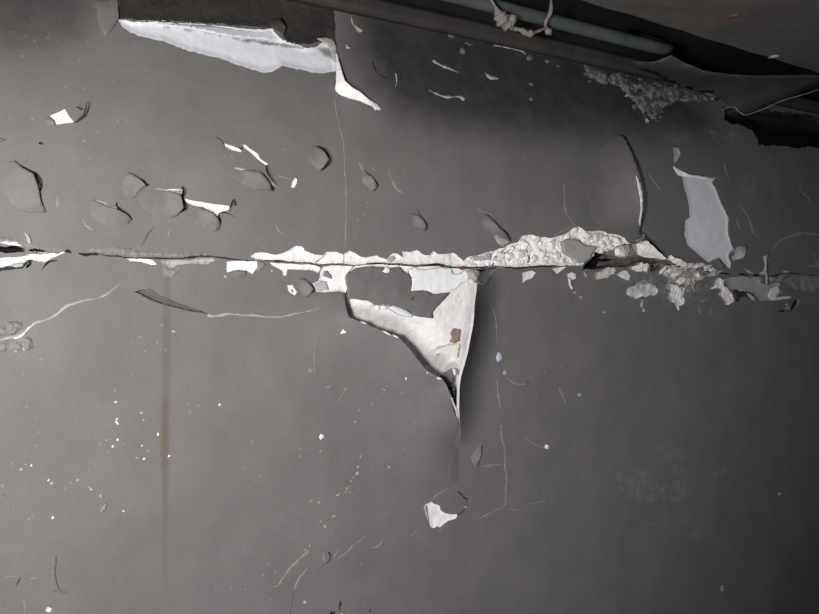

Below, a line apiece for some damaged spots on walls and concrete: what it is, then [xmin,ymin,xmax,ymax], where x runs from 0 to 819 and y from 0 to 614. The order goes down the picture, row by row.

peeling [90,0,381,110]
flaking render [0,233,64,270]
flaking render [128,258,215,268]
crack [0,230,556,273]
peeling [216,134,797,422]
crack [720,270,819,278]
peeling [136,288,207,315]
peeling [424,489,469,528]